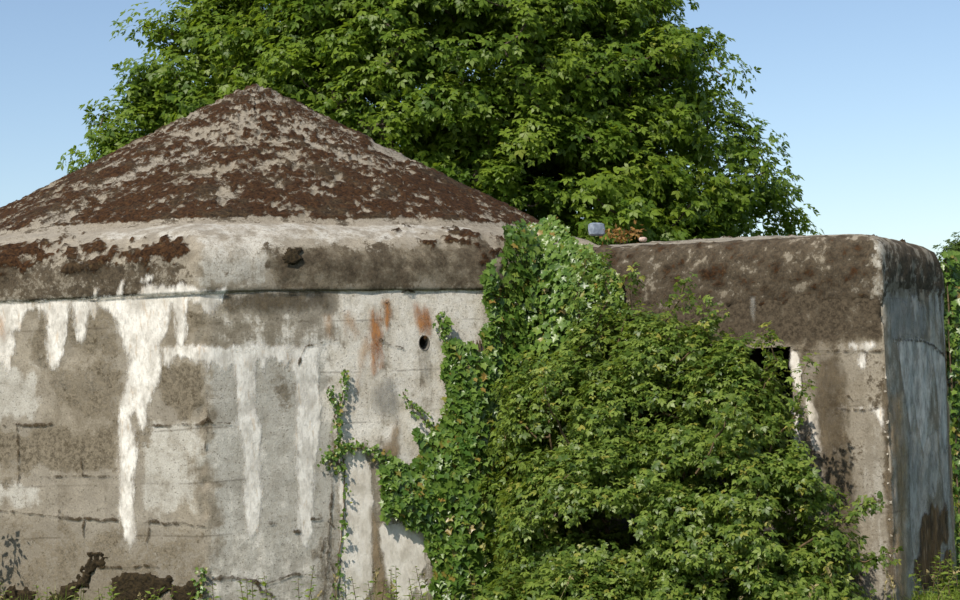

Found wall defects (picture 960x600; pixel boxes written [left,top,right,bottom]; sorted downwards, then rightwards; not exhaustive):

corrosion [371,302,390,371]
corrosion [416,306,431,331]
leakage [0,276,328,547]
peeling [915,502,952,590]